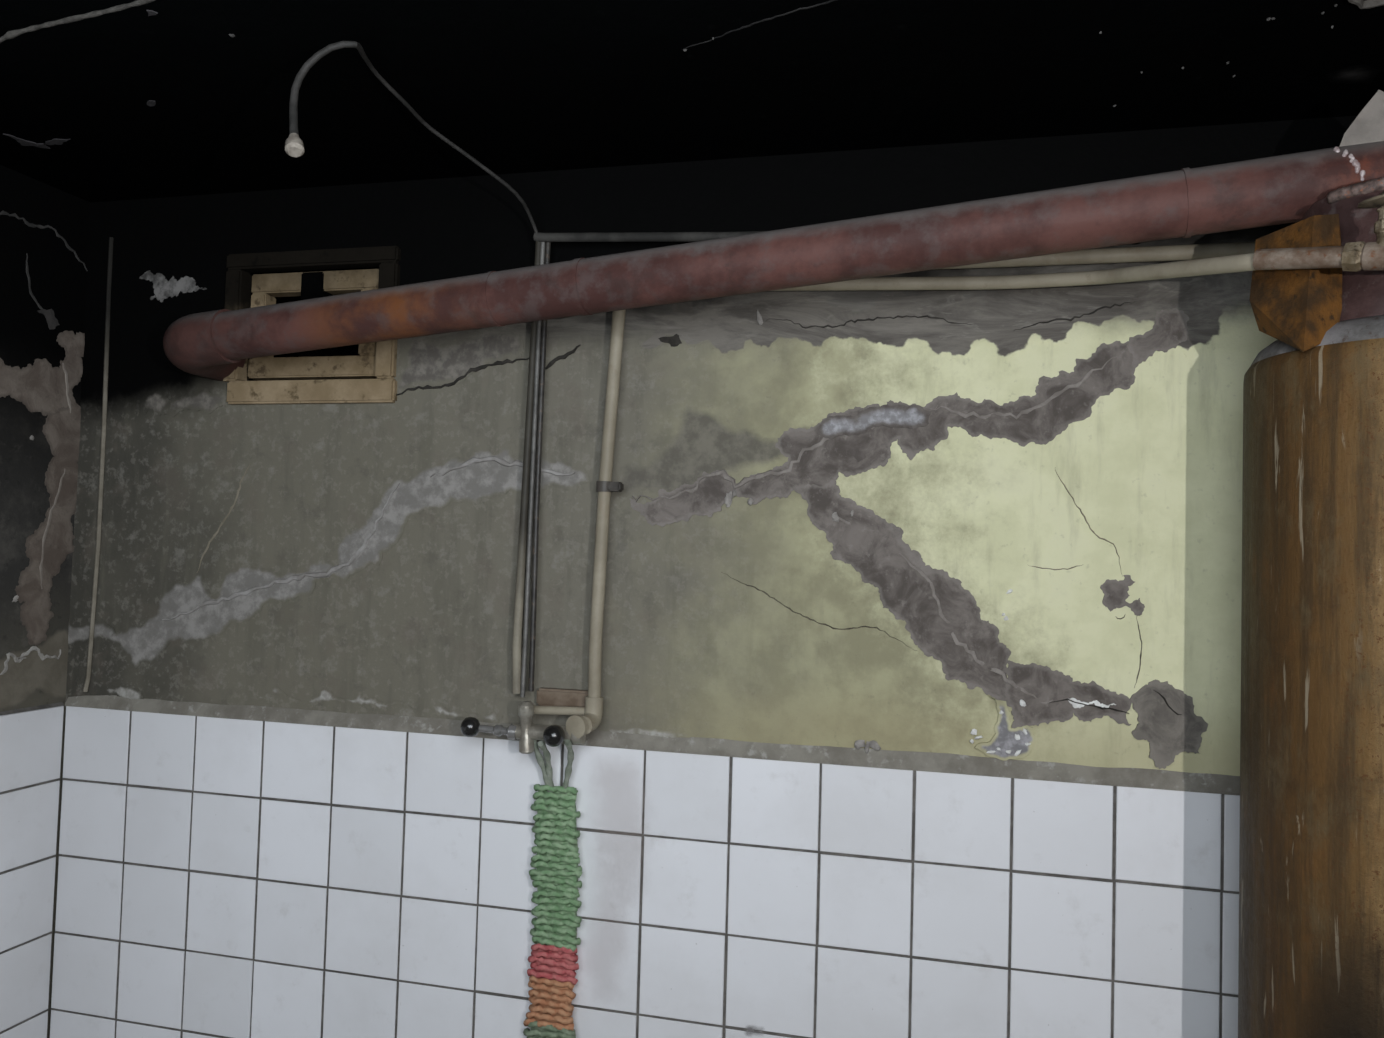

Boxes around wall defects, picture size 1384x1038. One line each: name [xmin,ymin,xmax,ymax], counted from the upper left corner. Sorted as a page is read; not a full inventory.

spalling [1348,0,1384,9]
crack [396,345,581,396]
peeling [0,330,85,646]
peeling [614,262,1230,769]
water stain [0,646,61,675]
water stain [970,696,1036,761]